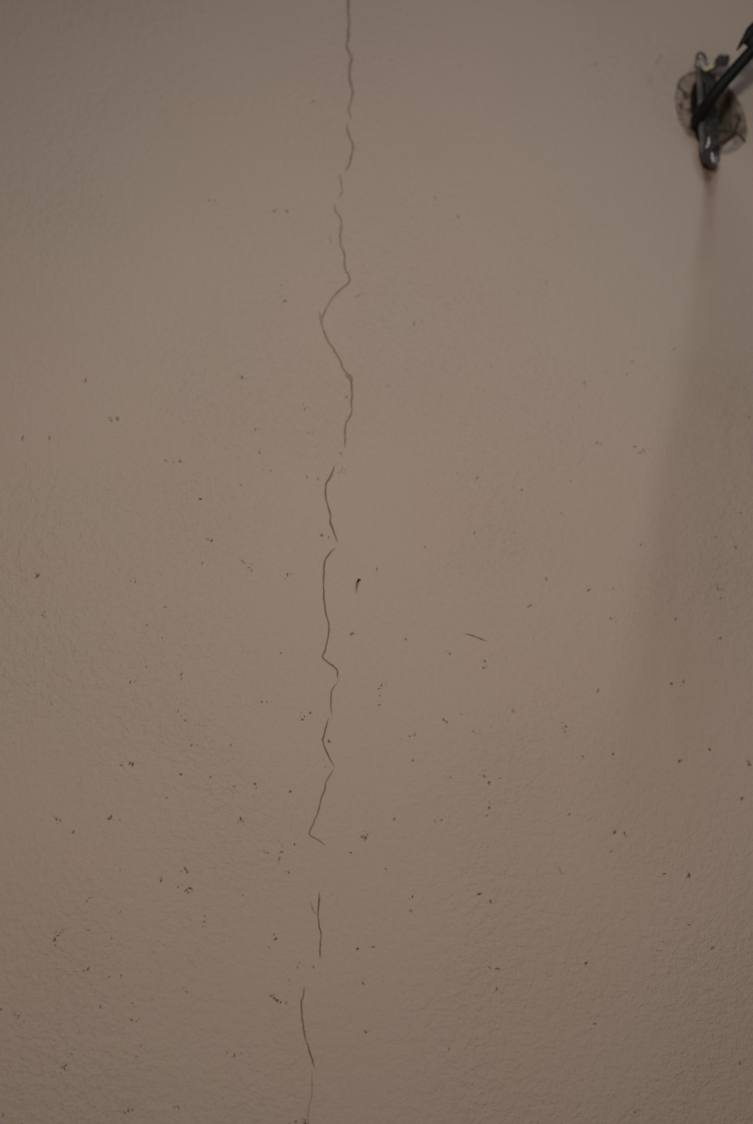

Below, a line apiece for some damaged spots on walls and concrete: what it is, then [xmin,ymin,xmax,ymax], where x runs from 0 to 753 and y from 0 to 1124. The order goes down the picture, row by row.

crack [322,471,338,692]